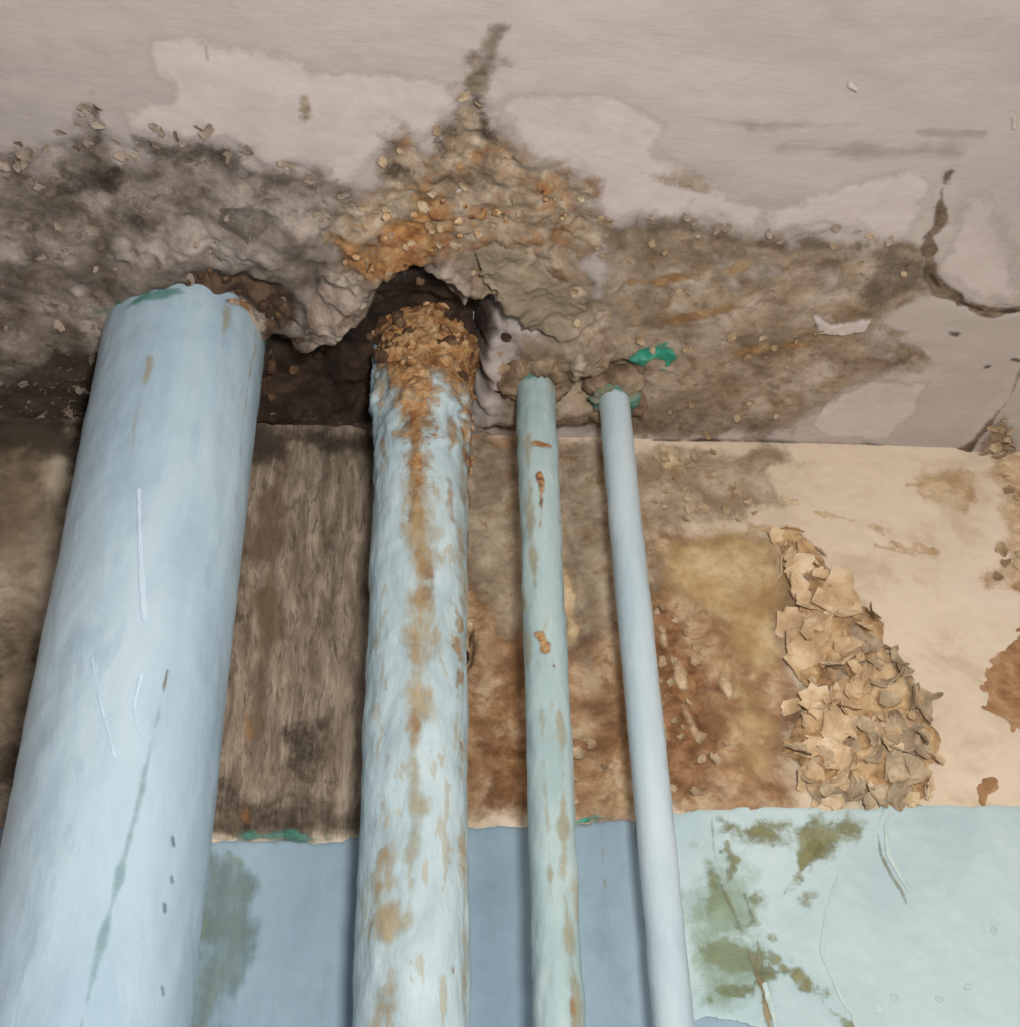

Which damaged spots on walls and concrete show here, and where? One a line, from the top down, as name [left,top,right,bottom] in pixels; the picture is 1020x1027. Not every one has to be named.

leakage [0,604,41,783]
leakage [0,103,372,591]
leakage [192,856,254,1027]
leakage [213,411,374,841]
leakage [466,398,527,816]
leakage [498,212,930,1002]
peeling [673,524,1020,1027]
crack [922,171,1020,318]
crack [958,419,993,452]